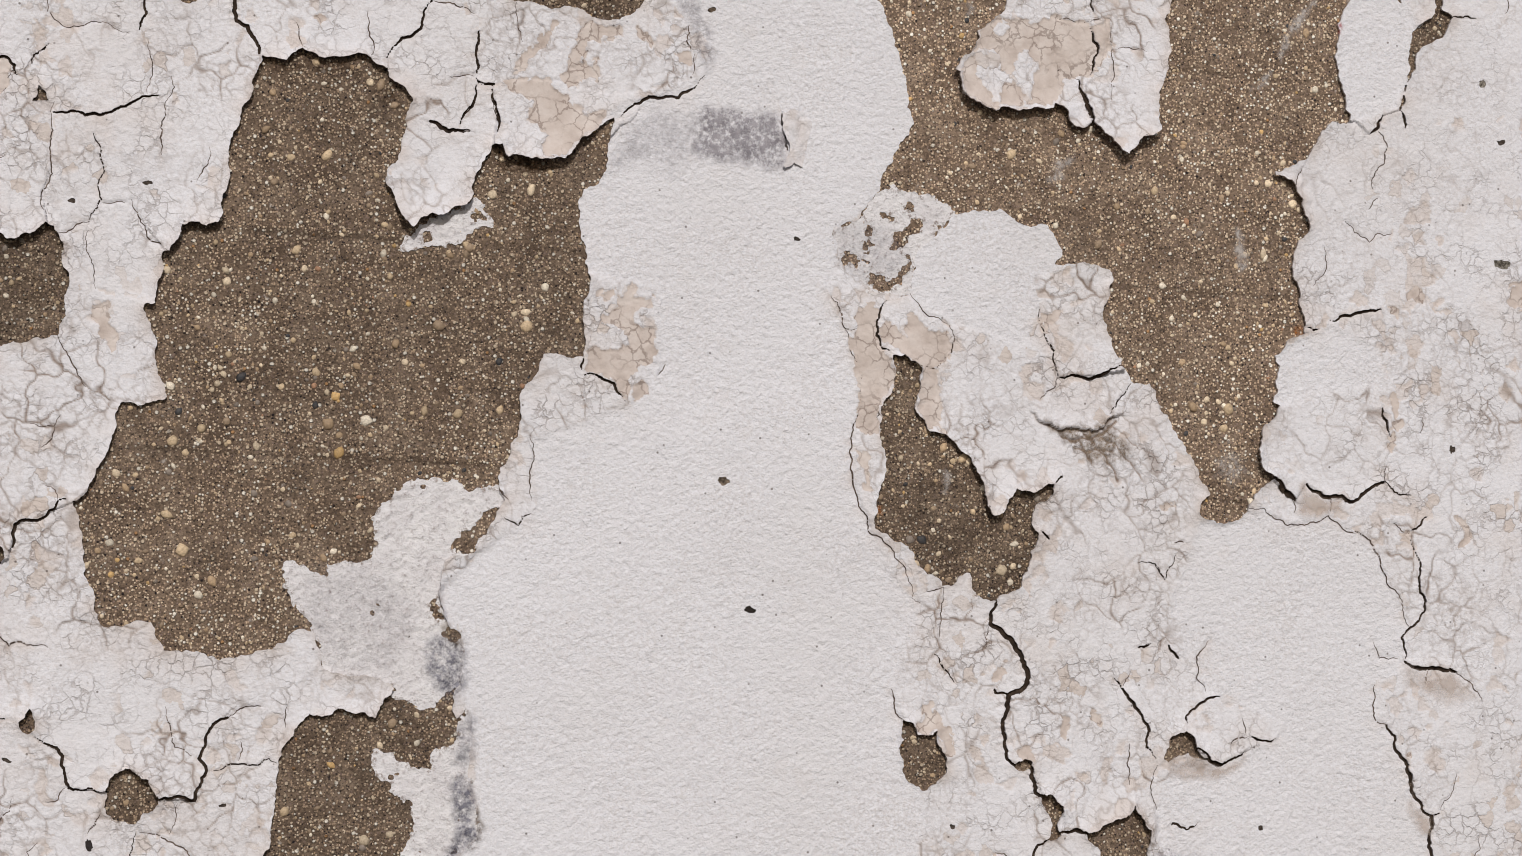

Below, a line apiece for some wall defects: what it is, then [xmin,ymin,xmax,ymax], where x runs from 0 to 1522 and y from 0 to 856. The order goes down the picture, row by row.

crack [0,0,175,289]
crack [232,0,261,54]
crack [367,0,501,133]
peeling [0,0,704,666]
peeling [841,0,1452,602]
peeling [19,671,215,824]
crack [129,705,287,856]
peeling [263,686,466,856]
peeling [899,701,955,791]
crack [985,602,1043,797]
crack [1116,641,1273,830]
crack [1249,408,1482,856]